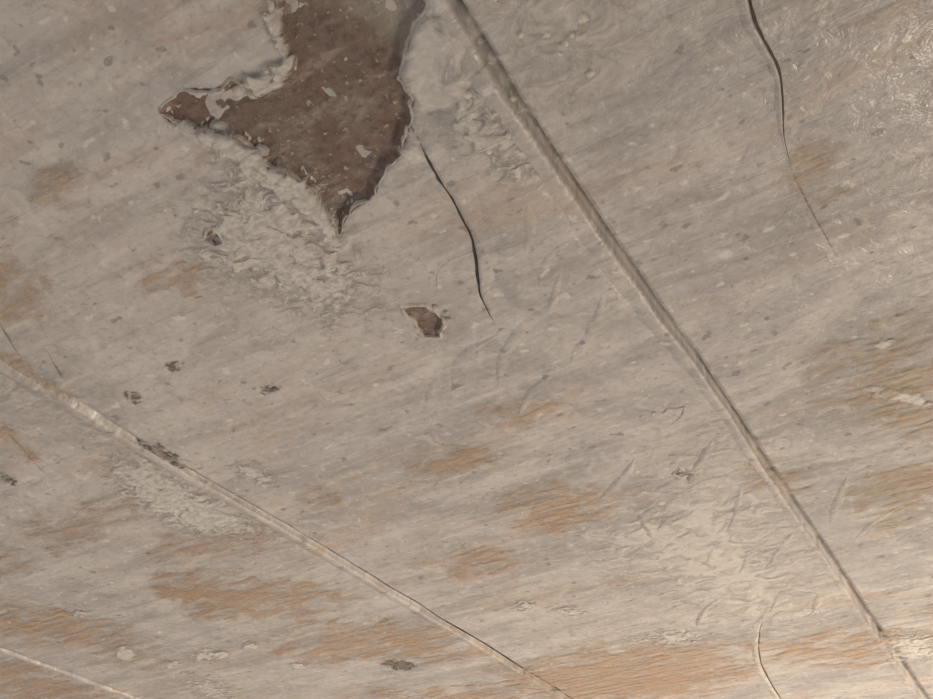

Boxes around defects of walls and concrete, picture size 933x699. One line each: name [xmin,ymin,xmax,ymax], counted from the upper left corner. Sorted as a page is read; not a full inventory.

peeling [158,0,539,332]
crack [411,124,499,322]
peeling [493,0,620,88]
crack [735,0,796,179]
spalling [397,302,452,339]